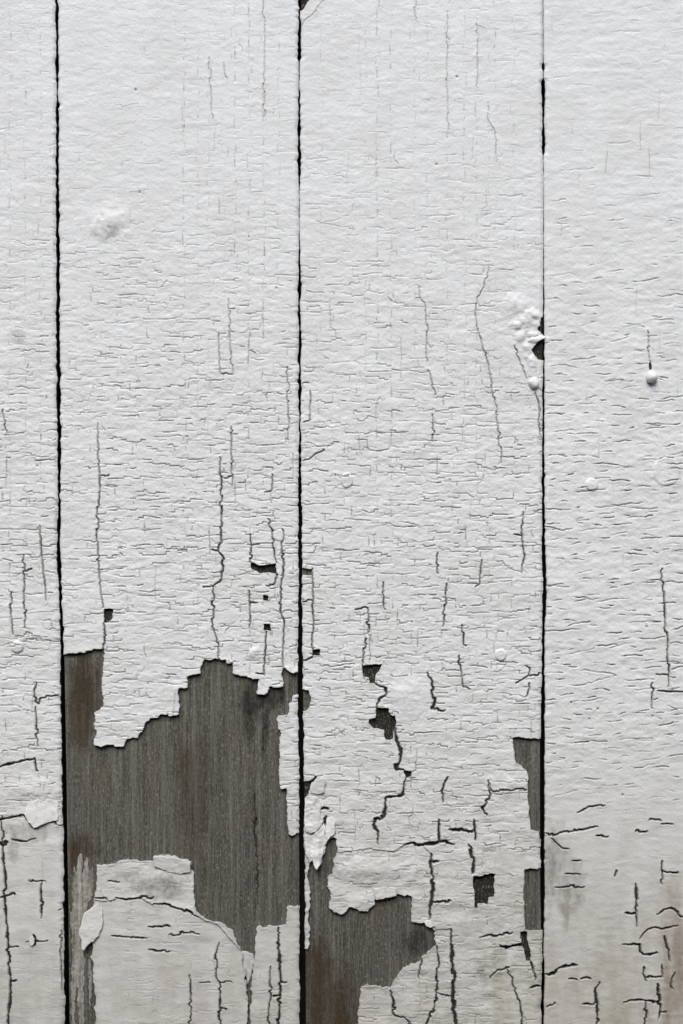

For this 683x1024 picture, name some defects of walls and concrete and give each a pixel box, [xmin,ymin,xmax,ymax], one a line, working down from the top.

crack [211,429,233,658]
crack [249,523,314,675]
crack [0,814,63,1024]
crack [96,881,230,1024]
peeling [64,649,436,1024]
crack [268,927,285,1024]
crack [372,685,405,840]
crack [391,777,491,1024]
peeling [473,873,495,908]
peeling [513,737,540,836]
crack [512,963,599,1024]
crack [614,862,683,1024]